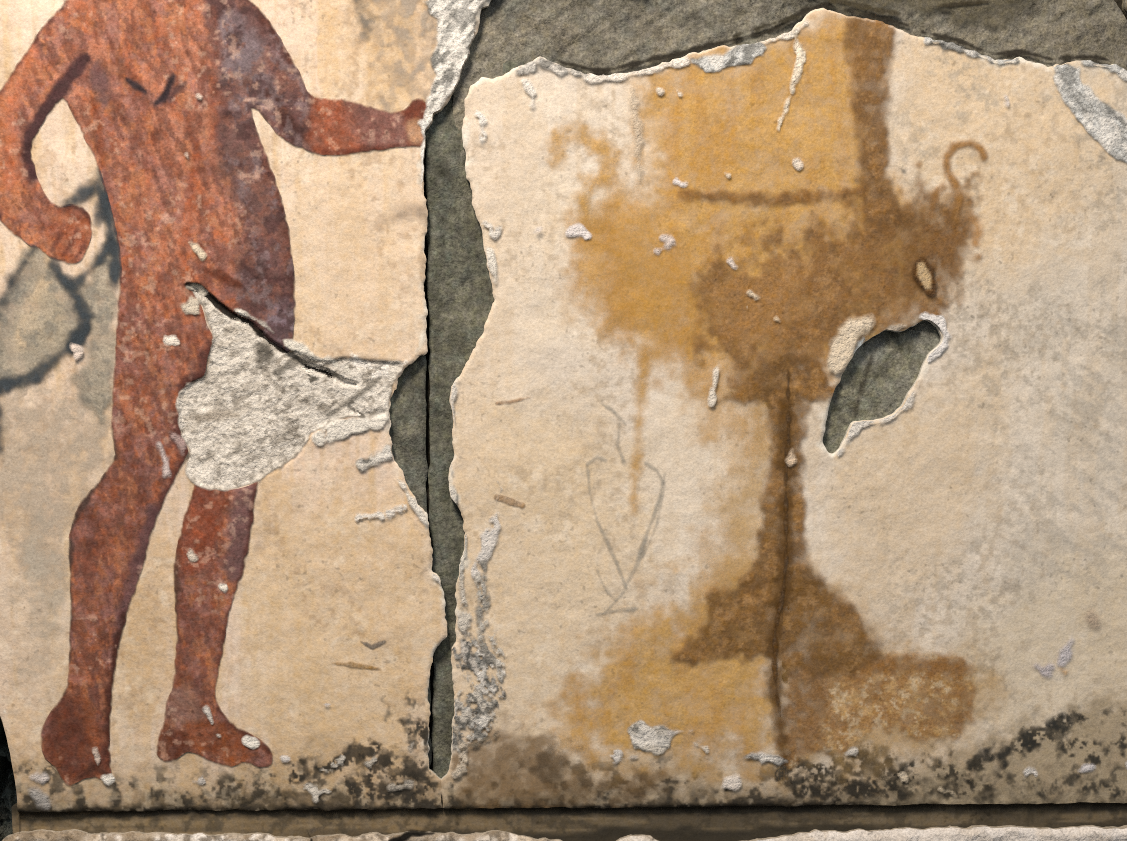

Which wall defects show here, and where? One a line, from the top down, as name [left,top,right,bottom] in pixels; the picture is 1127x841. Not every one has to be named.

spalling [418,0,484,181]
spalling [516,21,808,172]
spalling [924,37,1019,64]
spalling [1053,60,1127,162]
water stain [576,17,869,397]
spalling [157,283,408,491]
spalling [920,312,950,362]
water stain [452,432,774,807]
peeling [92,747,115,785]
peeling [242,736,259,748]
mould [263,697,436,809]
mould [775,699,1127,805]